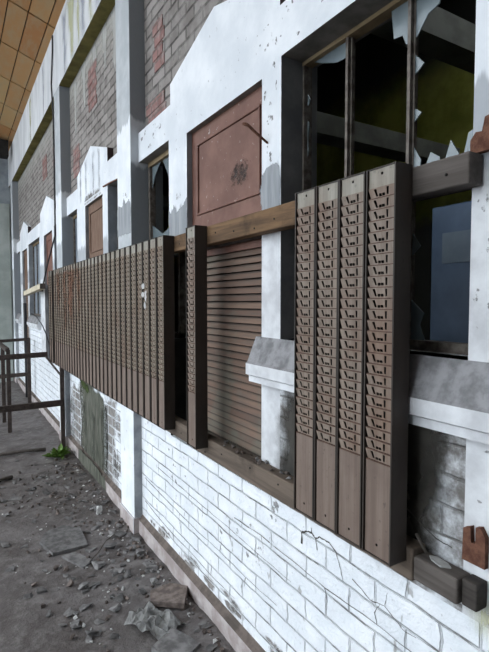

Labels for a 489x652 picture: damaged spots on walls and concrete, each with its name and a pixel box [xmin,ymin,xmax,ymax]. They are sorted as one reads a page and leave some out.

peeling [260,146,281,210]
damp [78,382,108,491]
damp [280,395,294,477]
damp [406,423,444,553]
crack [145,469,416,652]